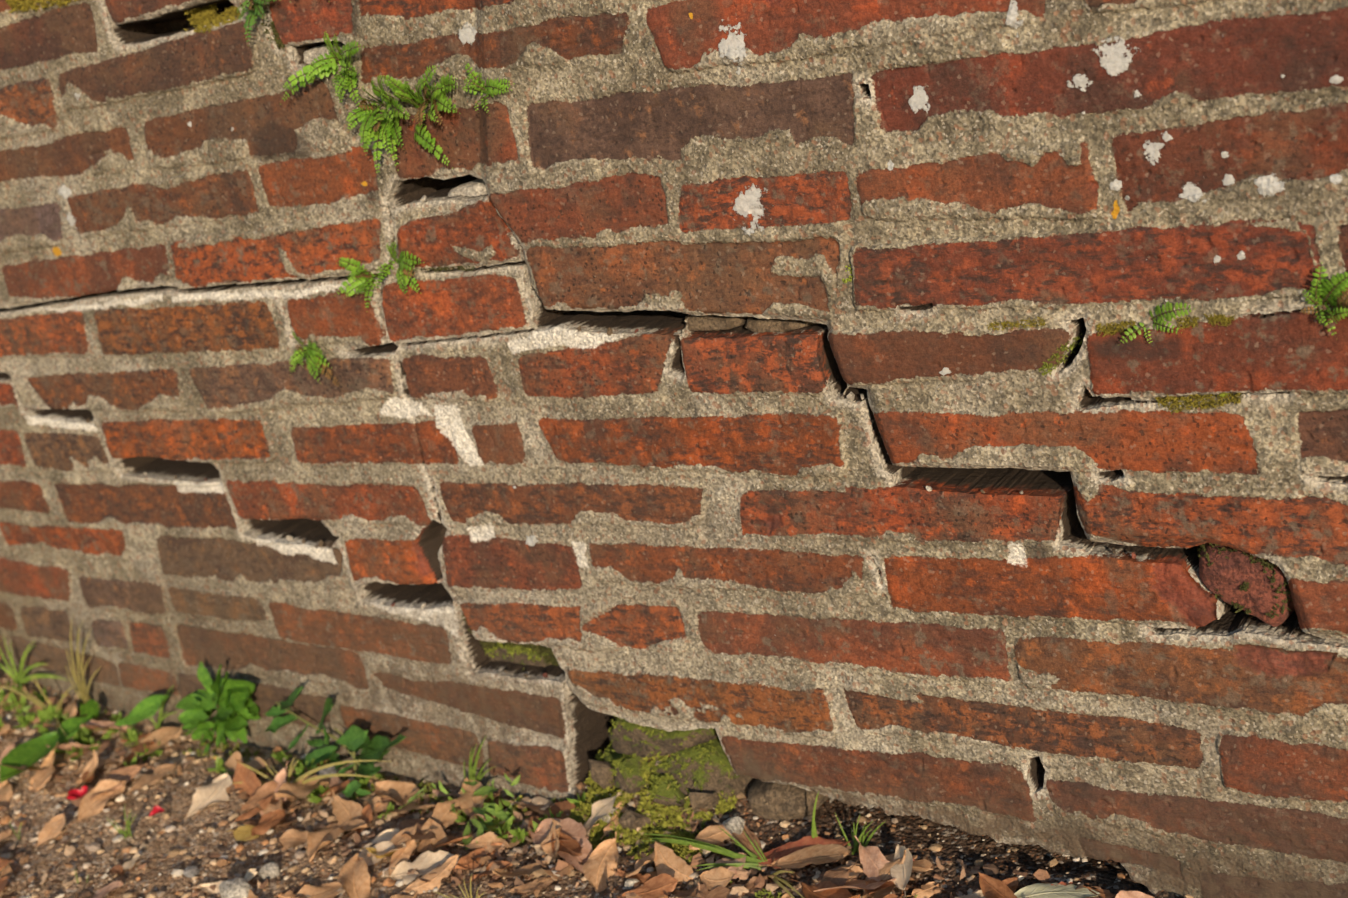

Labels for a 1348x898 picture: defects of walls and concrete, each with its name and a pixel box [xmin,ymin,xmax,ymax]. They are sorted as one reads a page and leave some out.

leakage [1110,0,1348,289]
crack [0,174,1348,797]